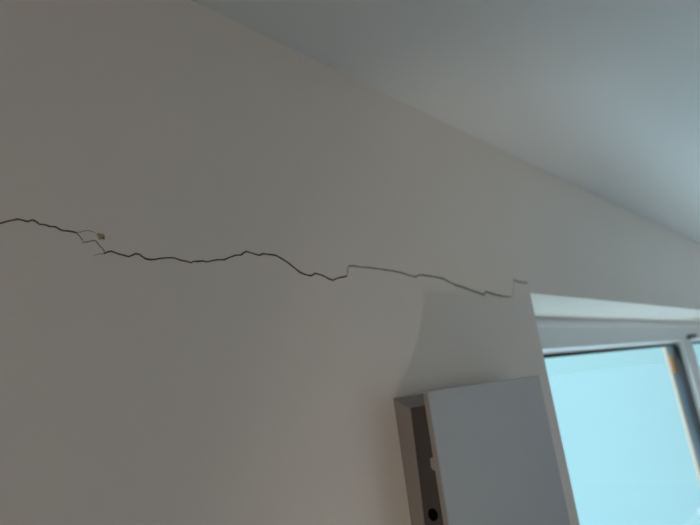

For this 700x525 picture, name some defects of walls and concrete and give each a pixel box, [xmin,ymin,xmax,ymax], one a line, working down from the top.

crack [0,218,528,297]